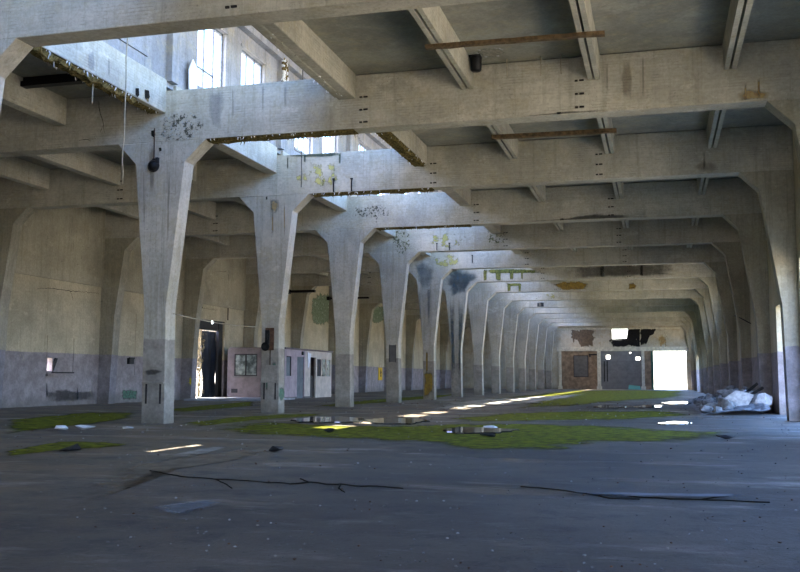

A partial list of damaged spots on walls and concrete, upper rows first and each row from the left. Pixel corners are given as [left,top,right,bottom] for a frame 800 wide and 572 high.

crack [149,470,403,493]
crack [520,486,770,503]